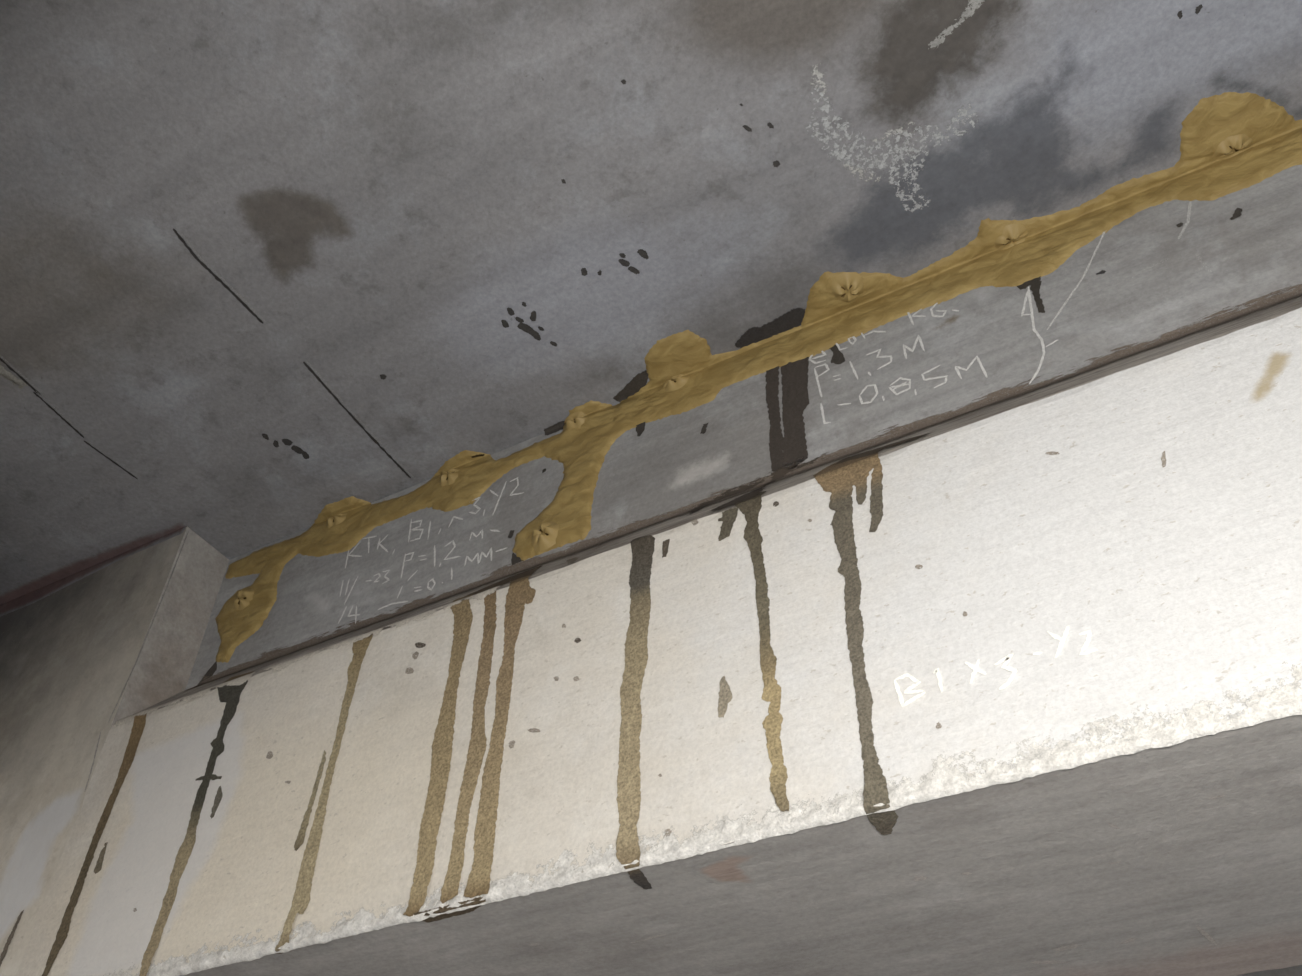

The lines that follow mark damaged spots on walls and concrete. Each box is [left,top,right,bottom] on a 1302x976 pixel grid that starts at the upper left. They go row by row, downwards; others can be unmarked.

leakage [801,0,1302,277]
crack [173,227,265,324]
leakage [229,179,361,293]
leakage [735,308,805,348]
crack [0,356,139,479]
crack [303,361,412,478]
leakage [710,357,810,811]